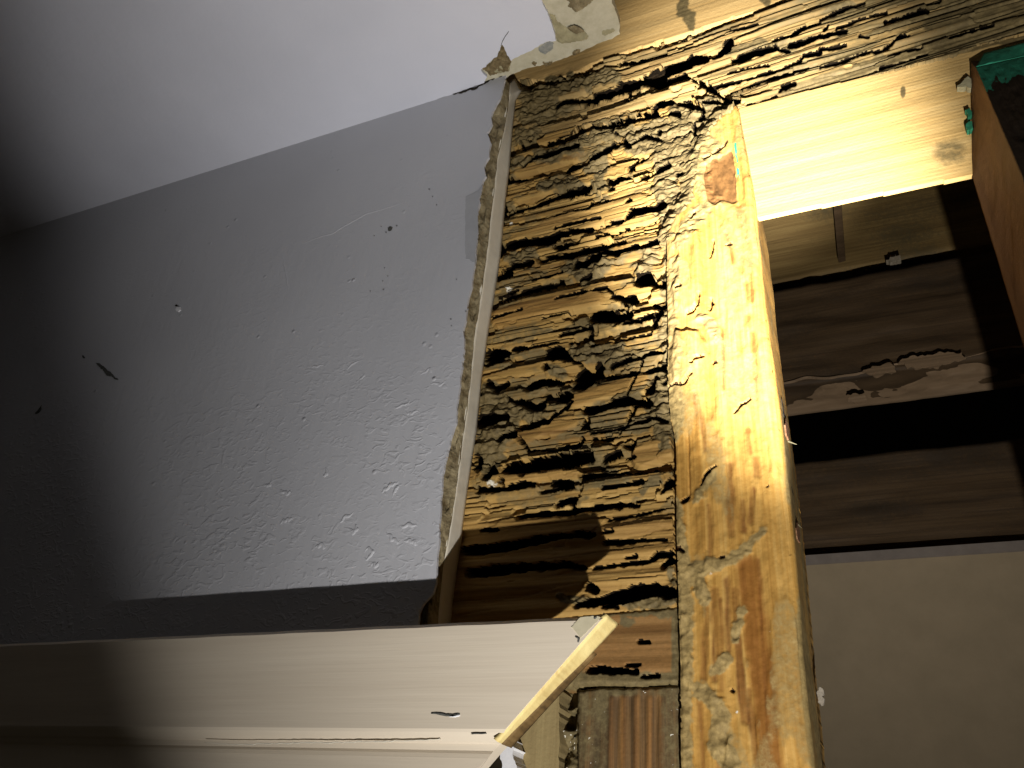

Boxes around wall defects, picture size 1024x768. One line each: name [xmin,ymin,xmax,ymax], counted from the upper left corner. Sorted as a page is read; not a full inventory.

flaking render [550,0,593,56]
flaking render [482,45,511,76]
peeling [510,61,706,171]
peeling [465,185,483,264]
peeling [498,246,540,280]
spalling [574,252,610,270]
spalling [590,247,682,344]
spalling [485,341,612,391]
spalling [627,360,668,395]
peeling [517,405,546,425]
spalling [483,464,505,482]
peeling [588,448,676,497]